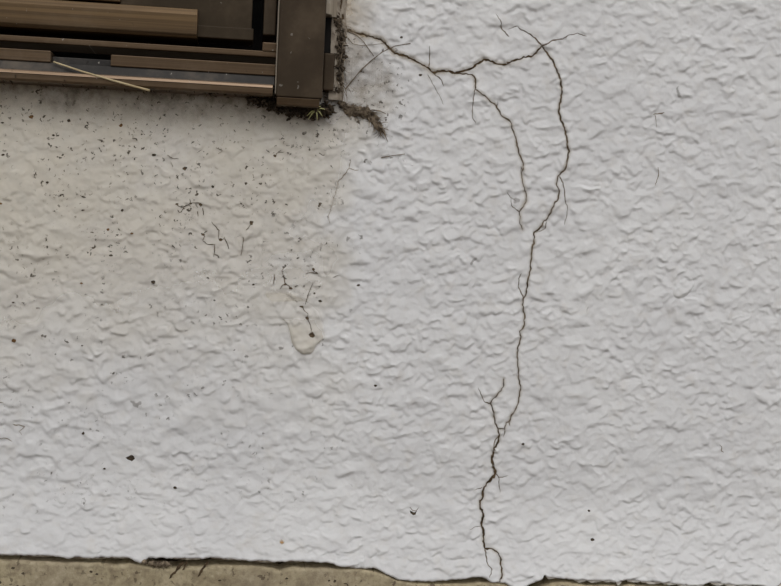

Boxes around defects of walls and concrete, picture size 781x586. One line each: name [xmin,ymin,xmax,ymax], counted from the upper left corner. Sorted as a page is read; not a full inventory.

crack [334,0,585,582]